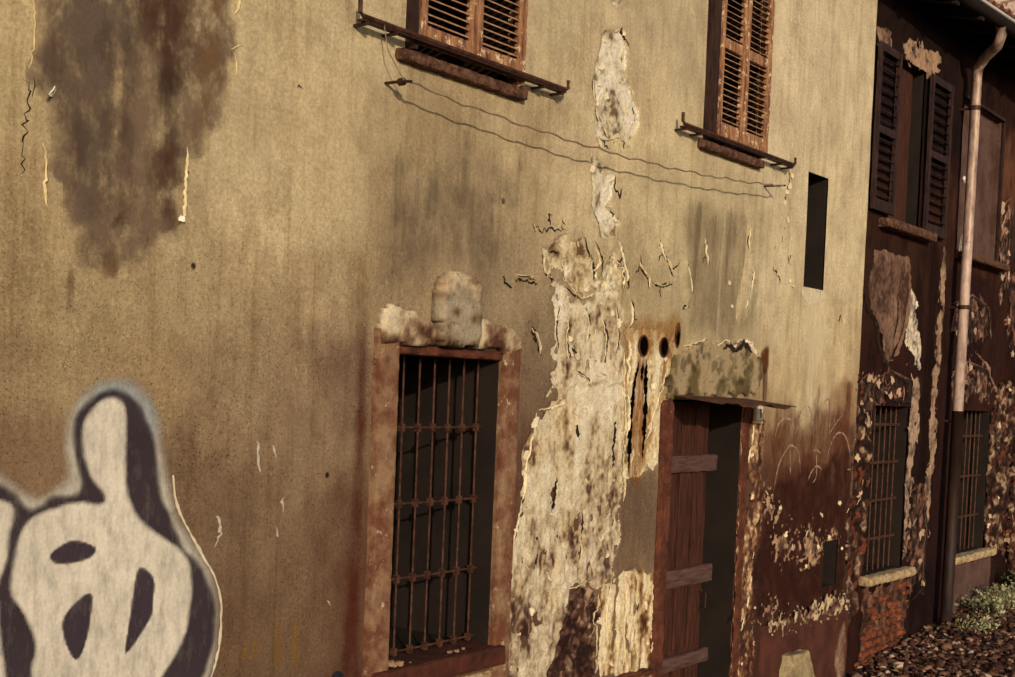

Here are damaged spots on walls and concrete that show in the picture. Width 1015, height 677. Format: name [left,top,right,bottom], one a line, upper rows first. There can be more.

leakage [37,0,234,275]
spalling [503,27,706,677]
rust [627,326,652,483]
peeling [718,339,758,356]
spalling [730,197,1015,677]